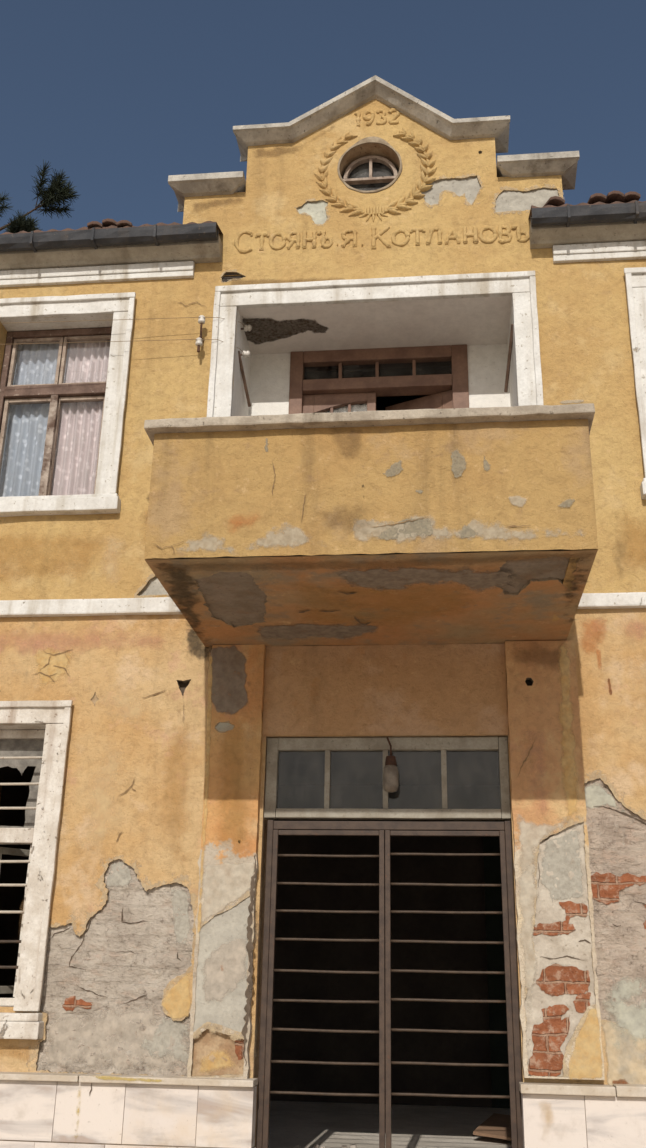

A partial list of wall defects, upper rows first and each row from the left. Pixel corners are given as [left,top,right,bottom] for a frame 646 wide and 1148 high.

flaking render [296,198,329,226]
flaking render [421,174,562,214]
peeling [379,517,433,540]
flaking render [134,574,170,598]
flaking render [195,572,377,640]
flaking render [26,645,257,1078]
flaking render [524,770,646,1077]